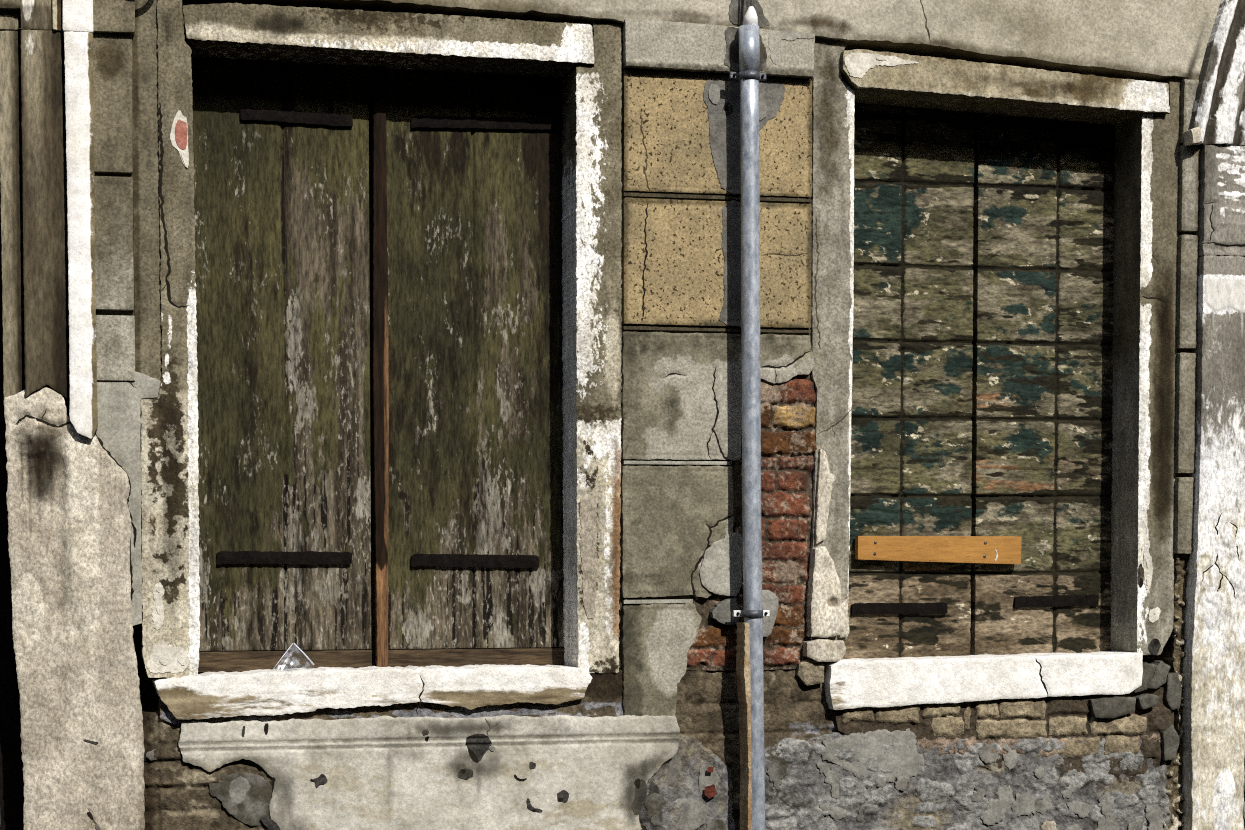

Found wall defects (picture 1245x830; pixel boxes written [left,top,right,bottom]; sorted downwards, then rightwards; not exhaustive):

peeling [844,52,919,78]
spalling [170,110,189,168]
crack [157,103,189,307]
crack [640,115,650,321]
leakage [27,435,57,497]
crack [707,368,733,466]
spalling [686,424,744,671]
spalling [761,378,817,670]
crack [1201,513,1240,599]
crack [1036,659,1048,694]
spalling [142,709,281,830]
spalling [634,734,735,830]